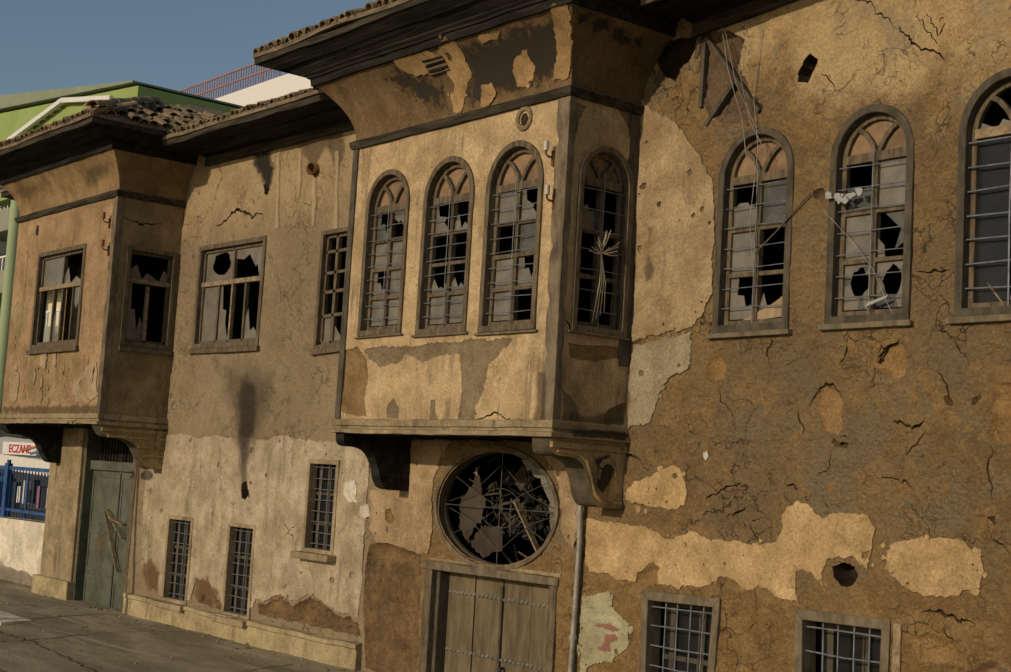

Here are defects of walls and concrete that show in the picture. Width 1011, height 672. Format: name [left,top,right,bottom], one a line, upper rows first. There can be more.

flaking render [393,35,473,113]
flaking render [480,83,497,107]
flaking render [512,49,535,88]
flaking render [550,3,574,80]
flaking render [699,30,763,124]
crack [856,0,968,86]
crack [212,163,264,226]
flaking render [604,100,716,429]
flaking render [342,337,512,420]
flaking render [141,433,453,672]
flaking render [544,455,988,603]
flaking render [575,592,633,672]